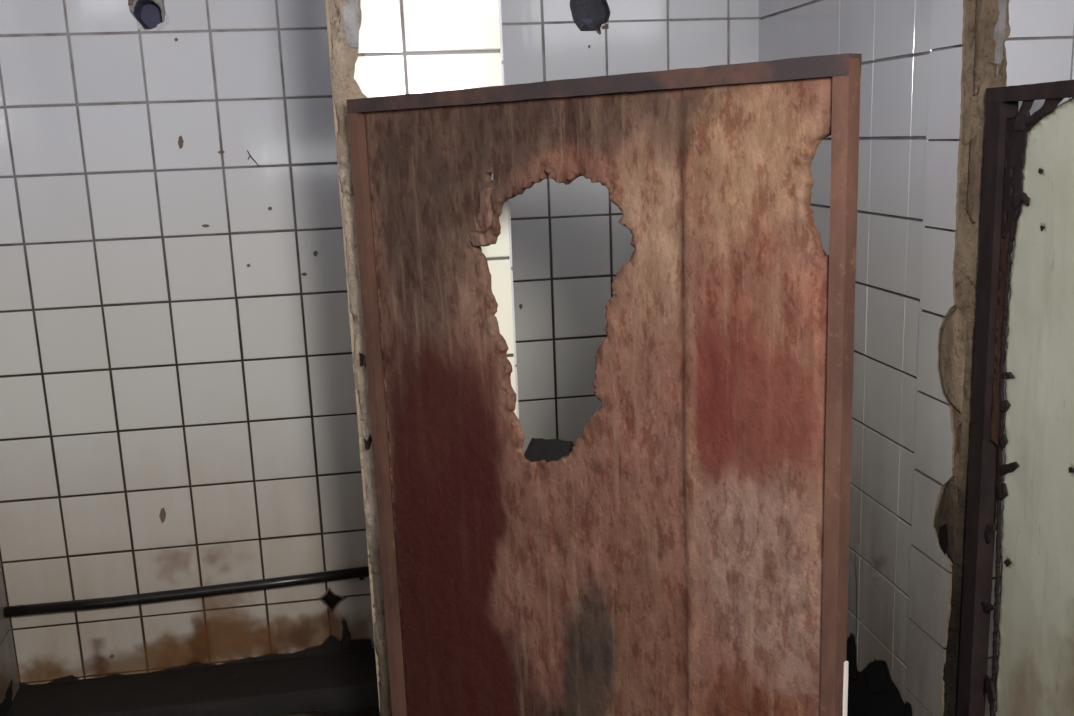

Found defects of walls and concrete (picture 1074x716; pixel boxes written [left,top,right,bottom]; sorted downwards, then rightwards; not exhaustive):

spalling [128,0,169,31]
hole [570,0,610,35]
rust [474,187,493,232]
flaking render [328,0,392,716]
flaking render [934,0,1010,716]
leakage [152,619,372,673]
leakage [47,675,80,684]